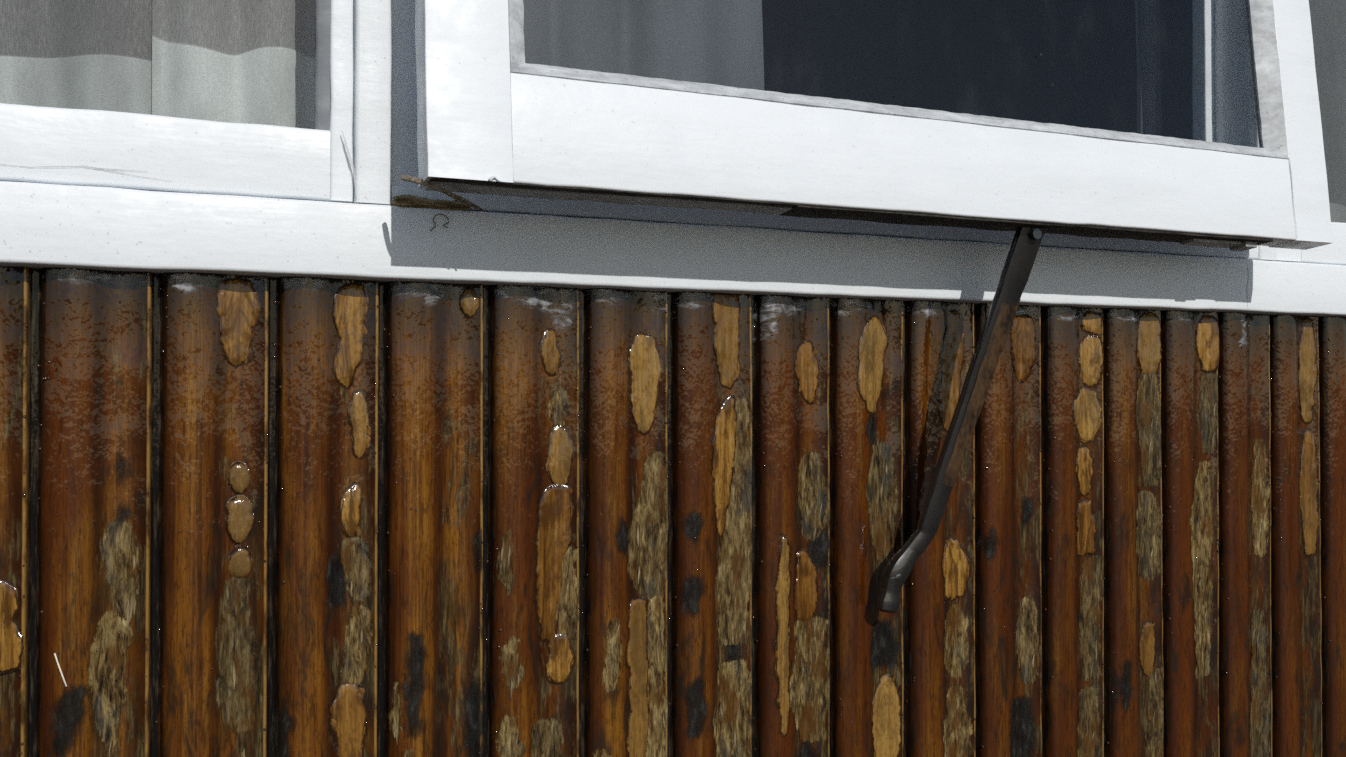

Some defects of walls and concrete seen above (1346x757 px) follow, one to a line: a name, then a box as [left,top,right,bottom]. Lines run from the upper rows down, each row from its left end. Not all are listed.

peeling [333,280,371,460]
peeling [627,332,665,435]
peeling [710,294,743,537]
water stain [866,417,877,444]
peeling [1072,310,1104,557]
water stain [49,685,86,757]
peeling [328,683,369,757]
water stain [404,634,426,736]
peeling [533,425,576,685]
water stain [680,577,703,616]
peeling [772,534,819,737]
peeling [869,672,902,757]